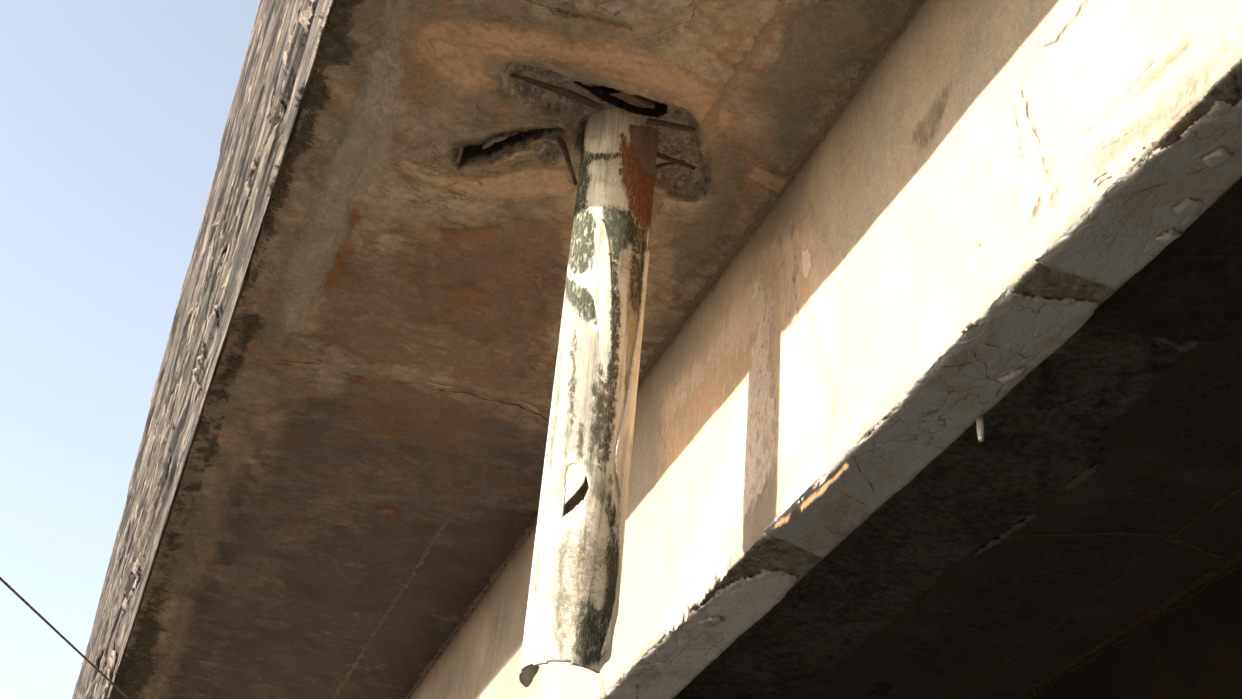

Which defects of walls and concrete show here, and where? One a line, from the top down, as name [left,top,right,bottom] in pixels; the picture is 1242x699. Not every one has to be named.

water stain [262,0,787,405]
spalling [501,63,712,203]
water stain [750,0,904,149]
crack [1014,0,1085,135]
peeling [1033,98,1242,289]
crack [1078,59,1205,159]
crack [250,358,549,421]
peeling [763,284,1098,557]
water stain [152,378,548,699]